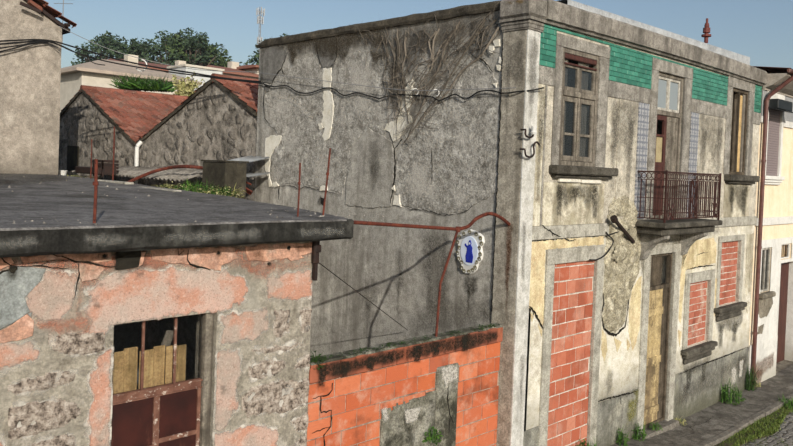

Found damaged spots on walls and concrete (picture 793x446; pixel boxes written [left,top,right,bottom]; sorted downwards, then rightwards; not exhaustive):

crack [263,52,288,123]
spalling [259,18,502,215]
crack [390,138,472,216]
crack [471,39,503,312]
crack [0,255,116,300]
crack [178,250,210,270]
spalling [529,195,642,361]
leakage [442,366,457,384]
crack [313,383,333,446]